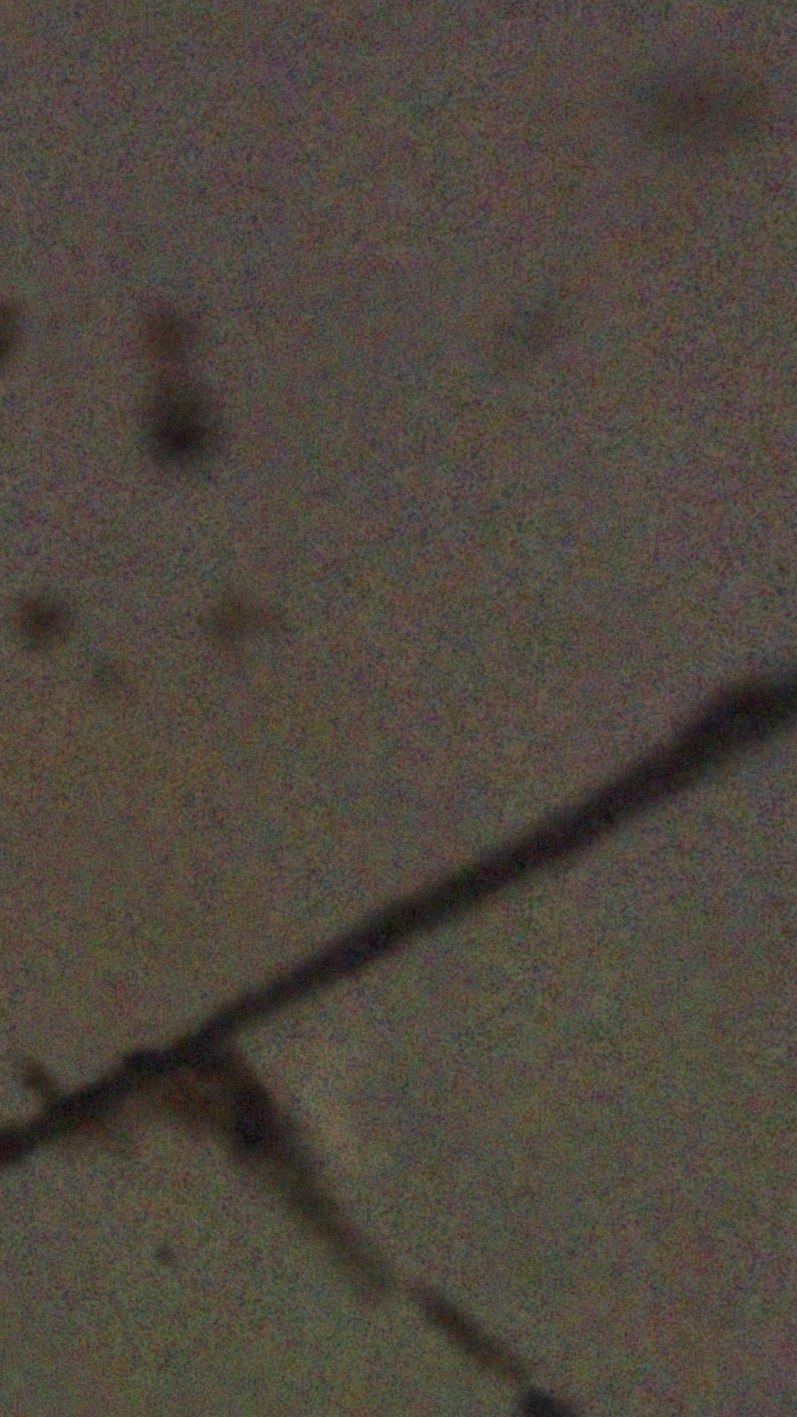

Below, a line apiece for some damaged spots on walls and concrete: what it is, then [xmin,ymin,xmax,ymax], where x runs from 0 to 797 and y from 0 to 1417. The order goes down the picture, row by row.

crack [0,677,797,1233]
crack [437,1308,481,1349]
crack [523,1393,571,1417]